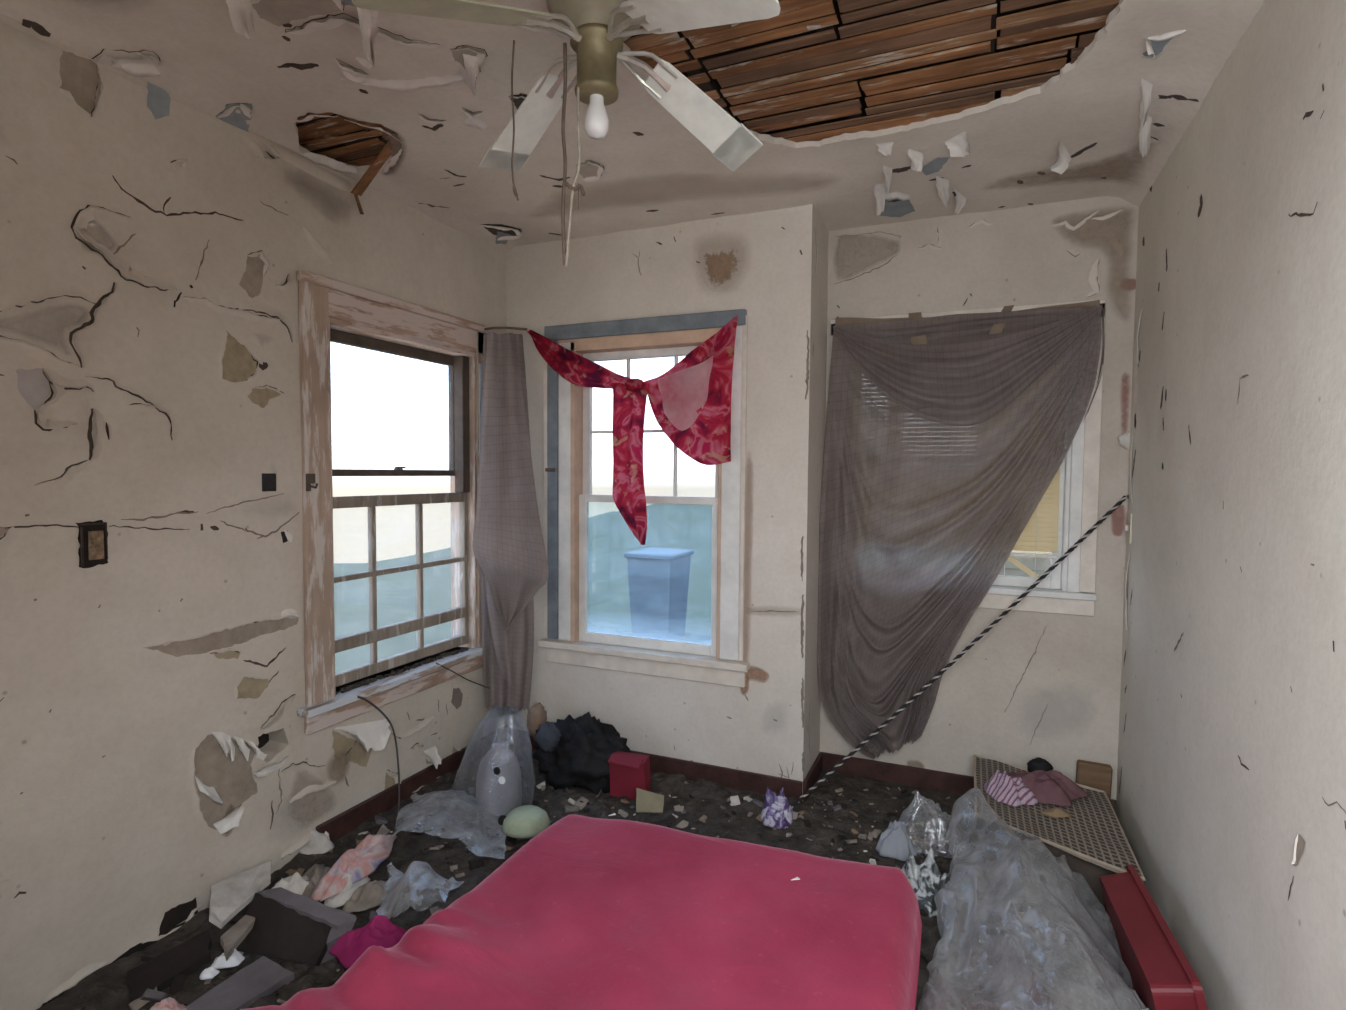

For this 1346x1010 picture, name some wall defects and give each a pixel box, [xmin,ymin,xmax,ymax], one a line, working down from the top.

peeling [59,49,171,120]
peeling [226,0,488,131]
crack [112,175,287,280]
flaking render [292,115,402,174]
water stain [704,251,738,284]
peeling [837,132,972,237]
peeling [15,204,297,490]
crack [5,493,299,539]
peeling [143,609,299,659]
peeling [186,694,337,835]
peeling [332,716,461,778]
flaking render [41,897,202,1007]